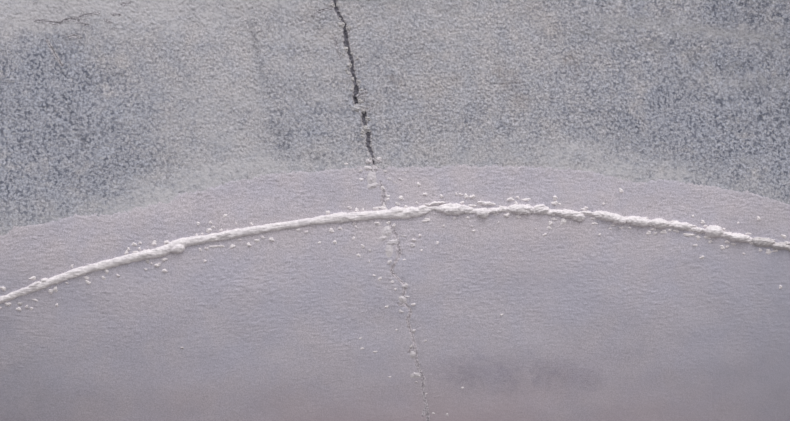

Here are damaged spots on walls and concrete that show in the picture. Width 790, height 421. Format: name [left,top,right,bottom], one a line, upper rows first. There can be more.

crack [33,1,131,66]
crack [311,0,448,421]